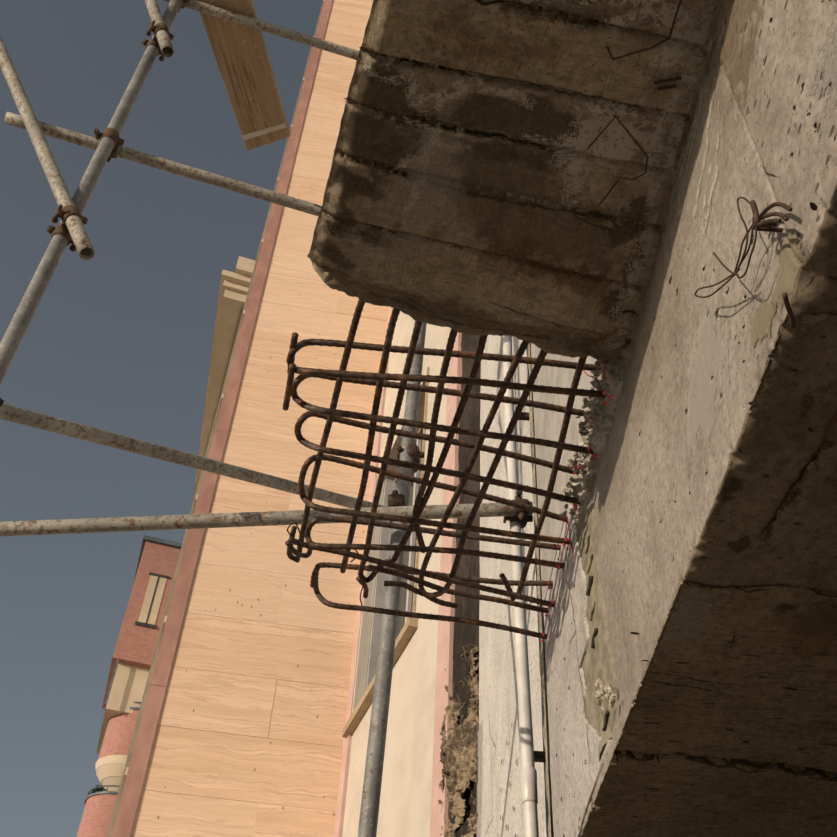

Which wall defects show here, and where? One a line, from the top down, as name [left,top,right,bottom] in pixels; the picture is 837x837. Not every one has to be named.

crack [359,47,665,116]
crack [343,98,605,159]
crack [333,150,617,229]
leakage [317,0,719,349]
spalling [282,260,624,755]
crack [683,580,837,597]
crack [615,748,837,781]